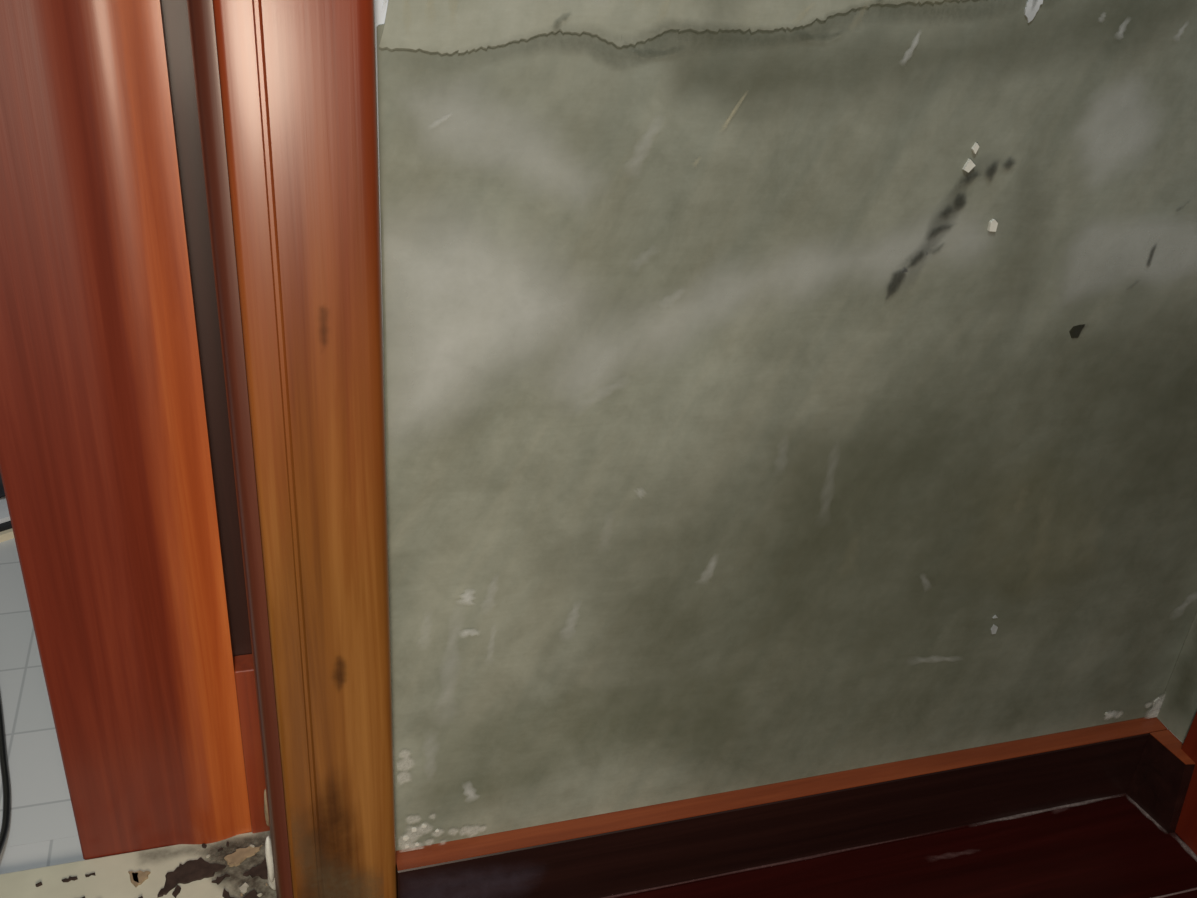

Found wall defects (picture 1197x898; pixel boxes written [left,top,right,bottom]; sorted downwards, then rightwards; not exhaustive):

peeling [377,0,1197,851]
peeling [128,789,276,898]
leakage [403,824,439,848]